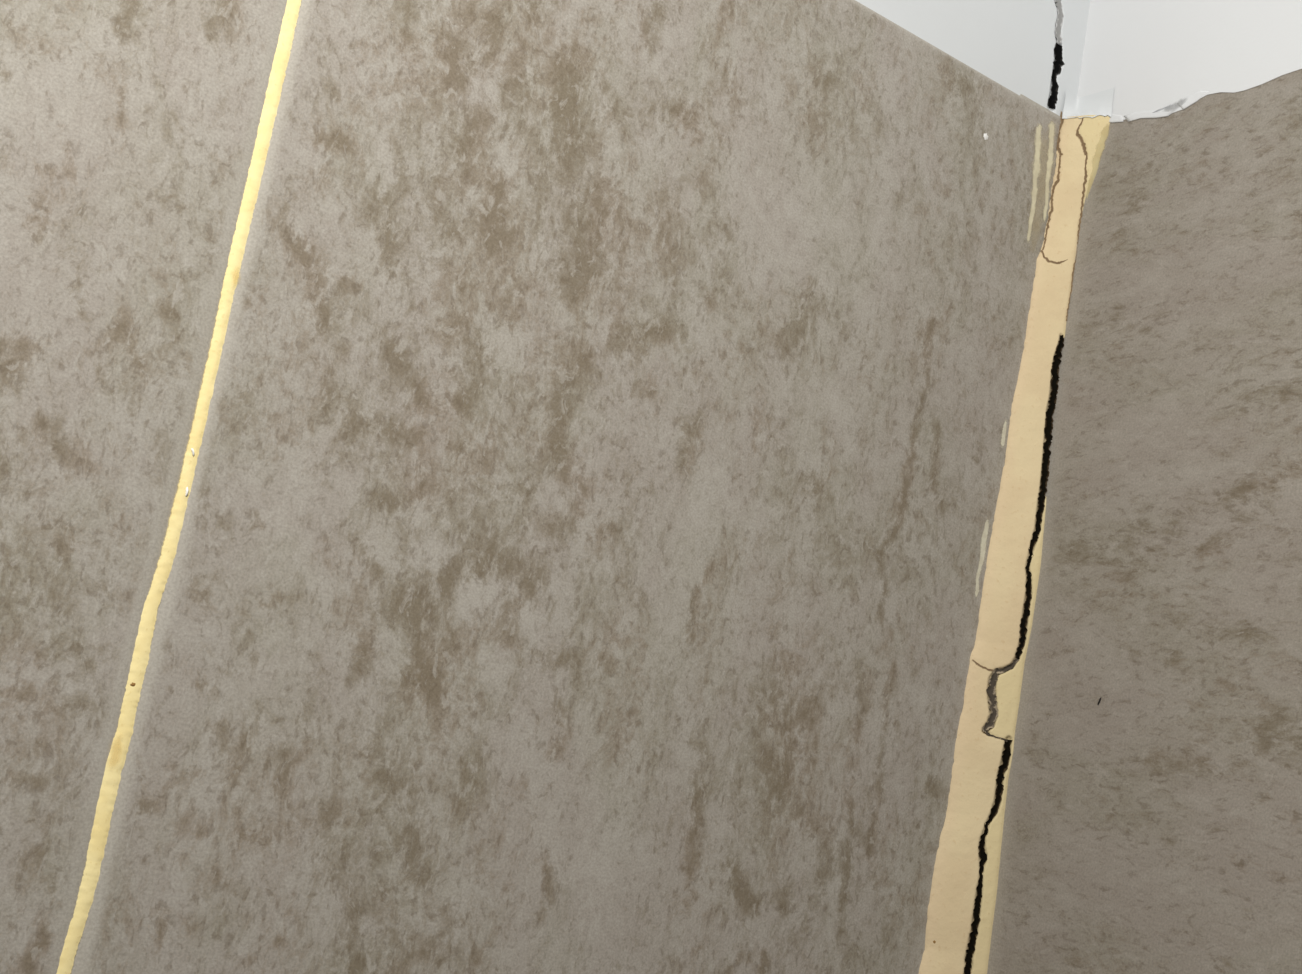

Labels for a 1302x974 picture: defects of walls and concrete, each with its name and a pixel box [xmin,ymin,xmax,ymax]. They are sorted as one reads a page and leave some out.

crack [964,0,1088,974]